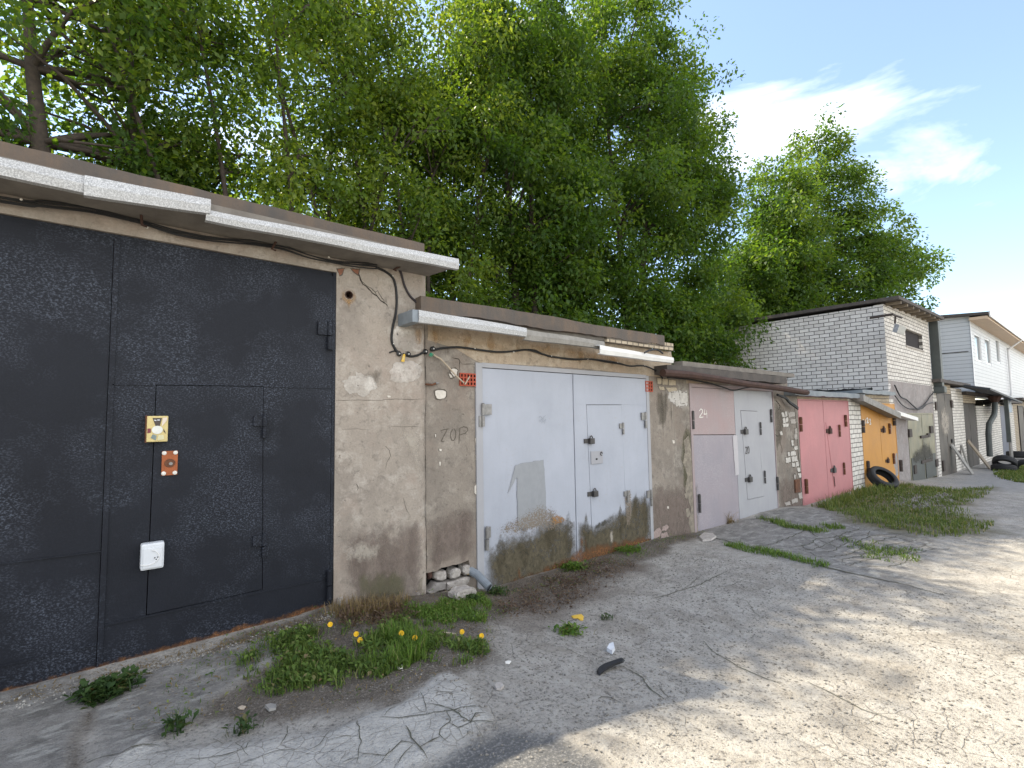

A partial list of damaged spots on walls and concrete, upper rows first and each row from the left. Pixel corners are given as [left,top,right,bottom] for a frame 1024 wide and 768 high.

crack [358,273,388,306]
peeling [656,377,688,405]
damp [658,390,688,422]
peeling [779,411,801,479]